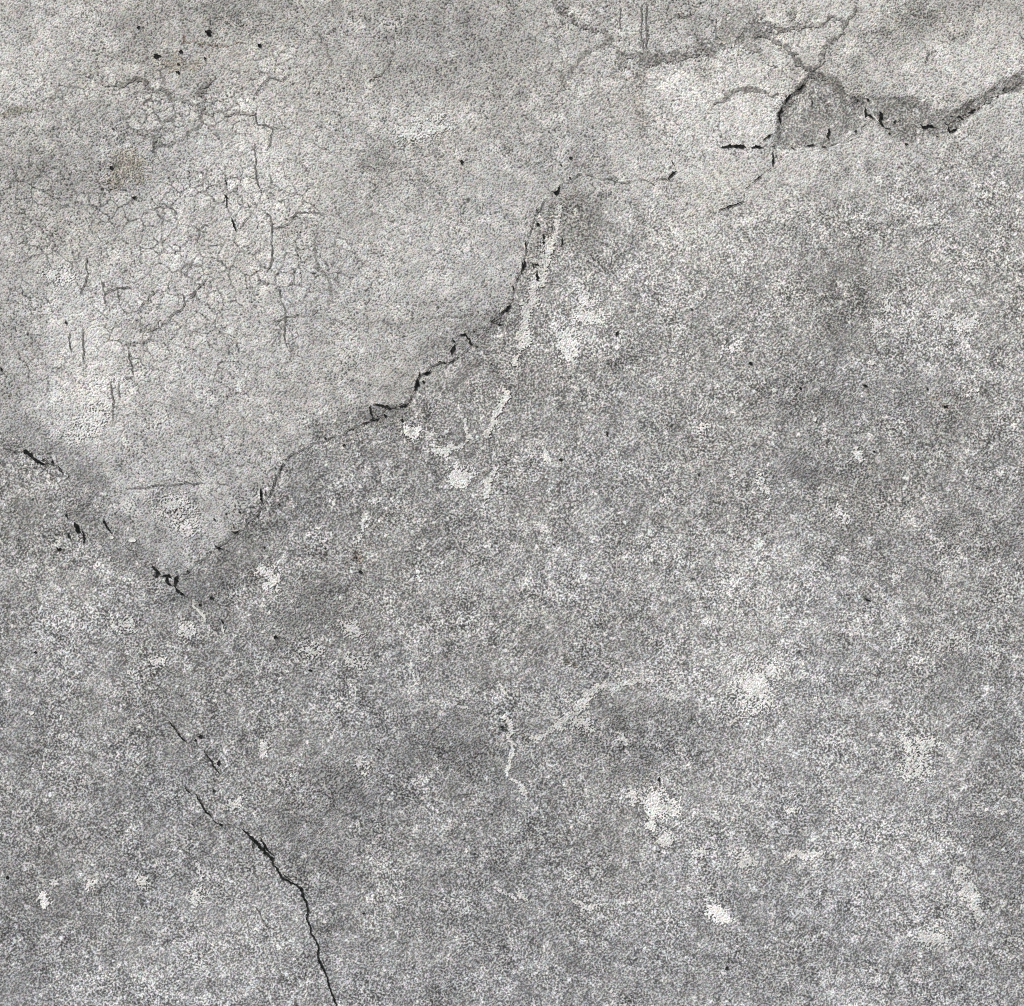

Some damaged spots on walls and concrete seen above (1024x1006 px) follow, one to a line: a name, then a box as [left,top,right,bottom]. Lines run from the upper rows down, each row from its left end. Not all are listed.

crack [314,30,332,72]
crack [719,85,1024,211]
crack [42,57,677,633]
crack [3,447,75,487]
crack [168,717,337,1006]